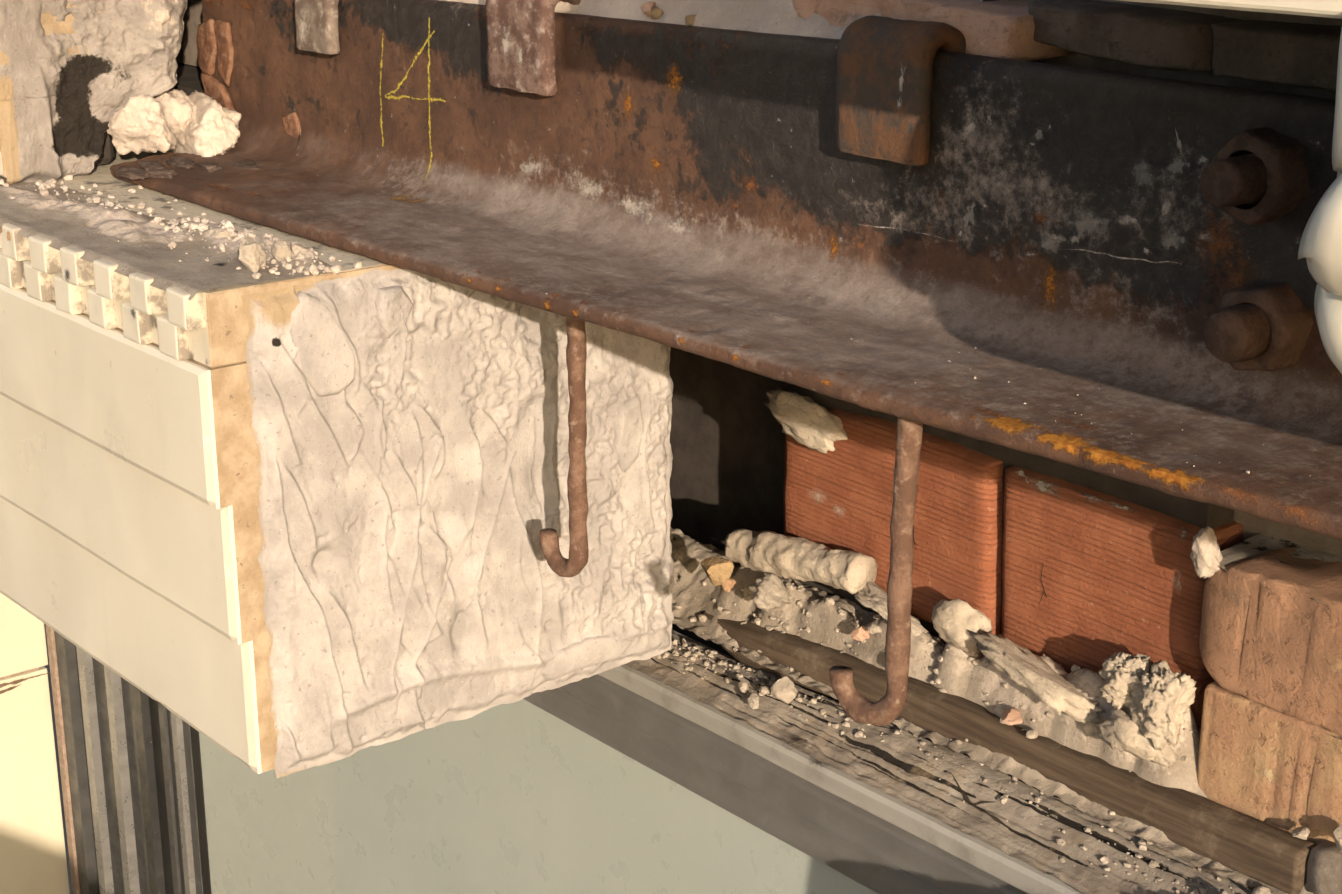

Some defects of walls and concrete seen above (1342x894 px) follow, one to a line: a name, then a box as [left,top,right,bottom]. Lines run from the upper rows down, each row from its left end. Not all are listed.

rust [196,19,235,110]
rust [282,112,301,138]
rust [115,155,260,180]
water stain [522,163,541,173]
water stain [570,177,602,195]
water stain [622,198,652,220]
rust [972,407,1204,491]